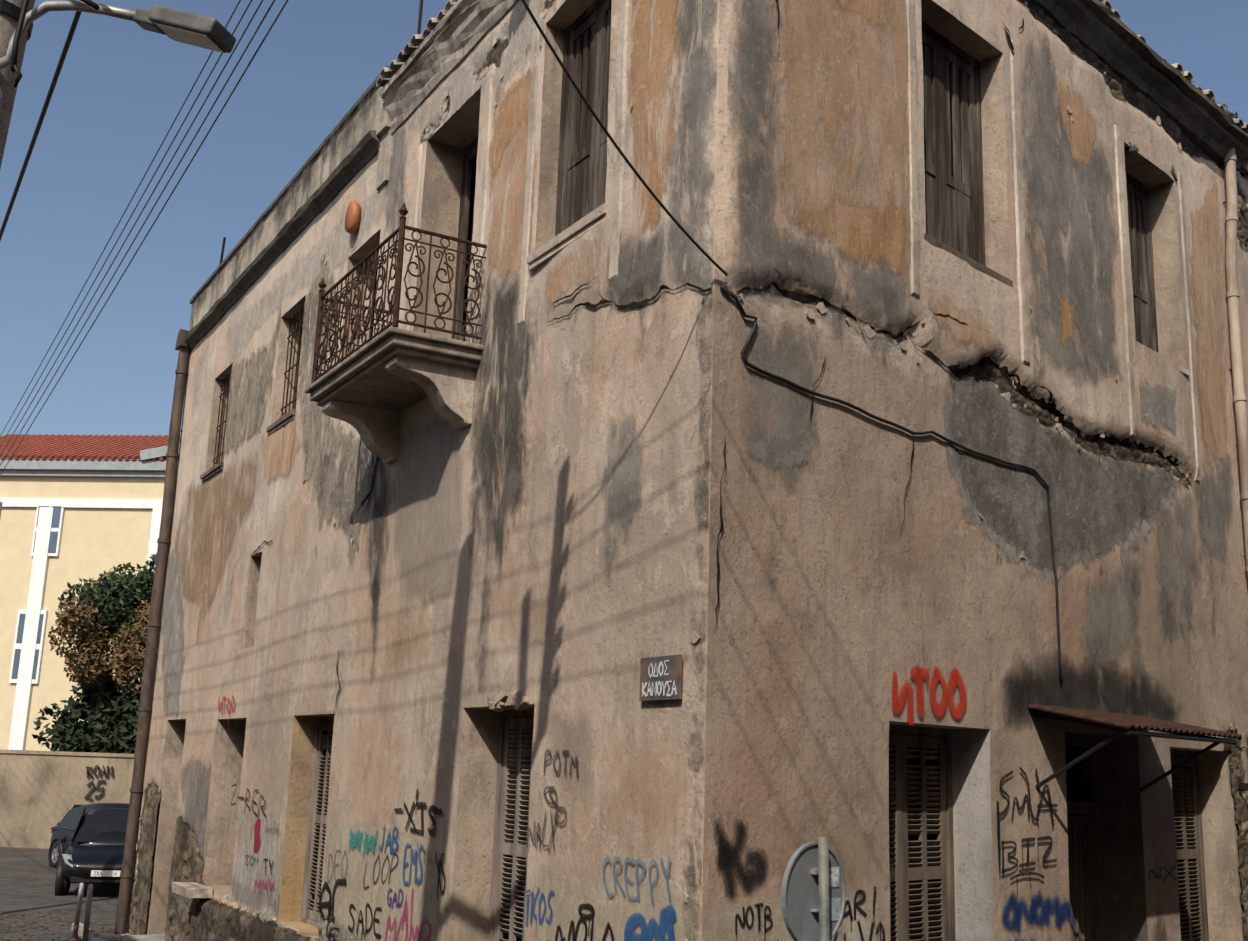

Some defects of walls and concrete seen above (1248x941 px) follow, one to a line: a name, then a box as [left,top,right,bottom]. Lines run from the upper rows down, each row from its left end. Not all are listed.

damp [367,454,388,620]
damp [474,284,530,565]
damp [604,414,640,536]
peeling [629,0,680,231]
damp [608,0,910,333]
peeling [782,0,918,275]
crack [545,262,1191,482]
spalling [930,294,1192,592]
peeling [1019,0,1225,382]
peeling [1191,185,1227,468]
spalling [1237,175,1248,252]
spalling [1224,723,1248,941]